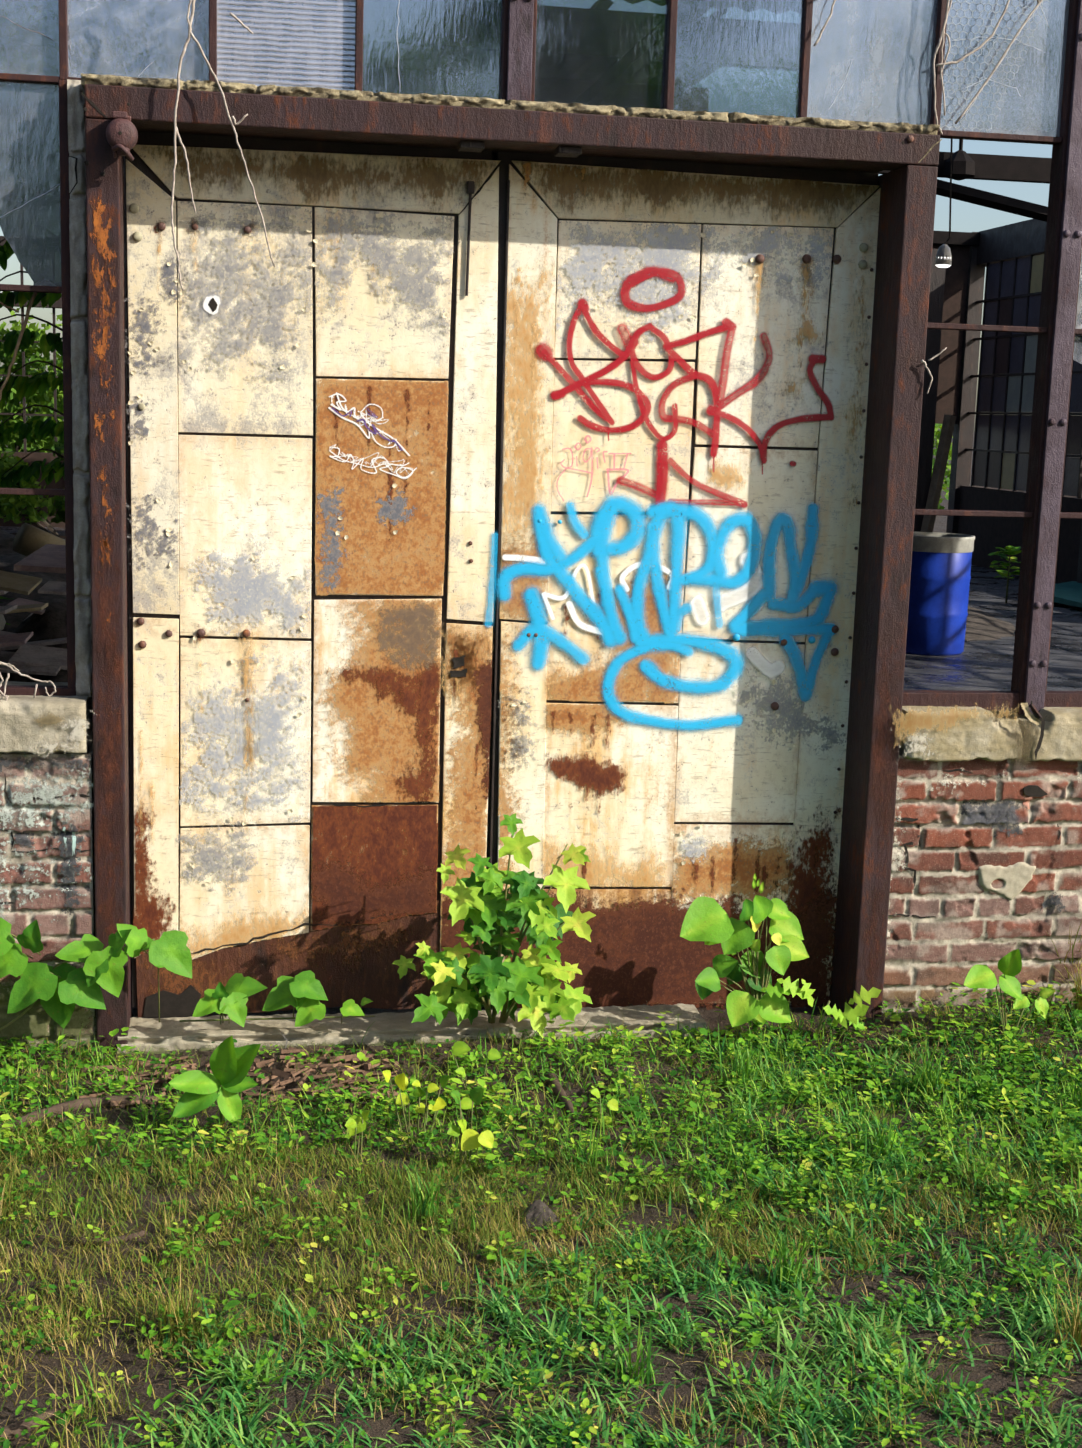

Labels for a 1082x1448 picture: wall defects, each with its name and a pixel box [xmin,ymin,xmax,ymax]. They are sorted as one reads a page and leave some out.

corrosion [89,196,117,442]
corrosion [94,269,553,1002]
corrosion [545,571,685,813]
corrosion [505,806,841,1010]